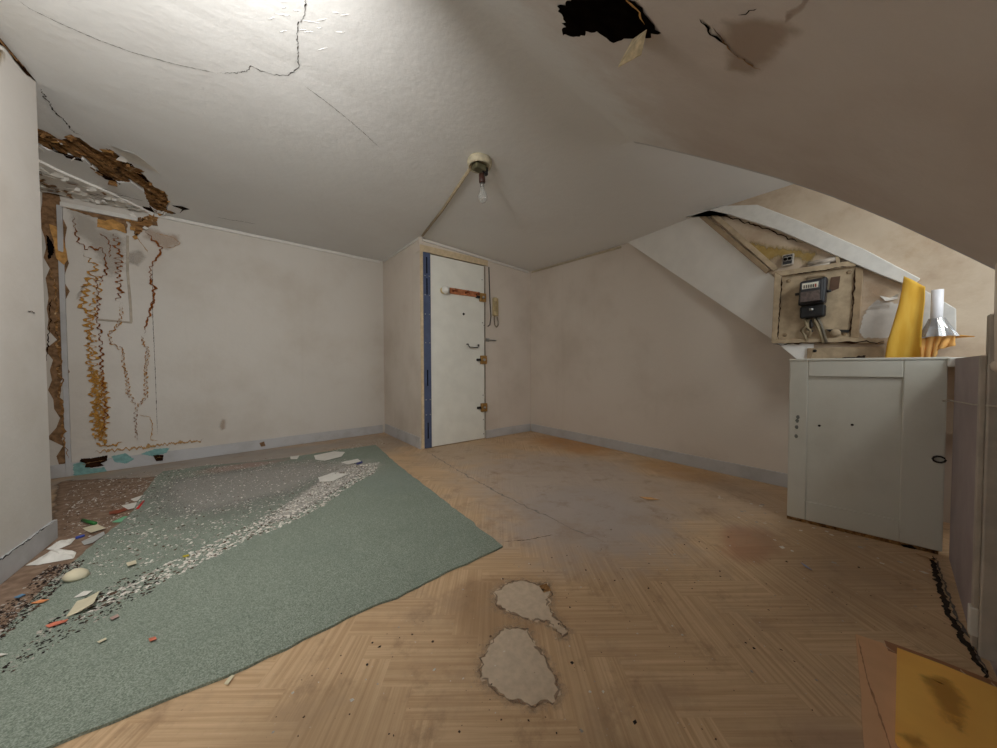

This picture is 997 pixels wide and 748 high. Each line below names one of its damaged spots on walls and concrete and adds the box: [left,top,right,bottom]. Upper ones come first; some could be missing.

flaking render [38,129,176,240]
peeling [0,448,169,629]